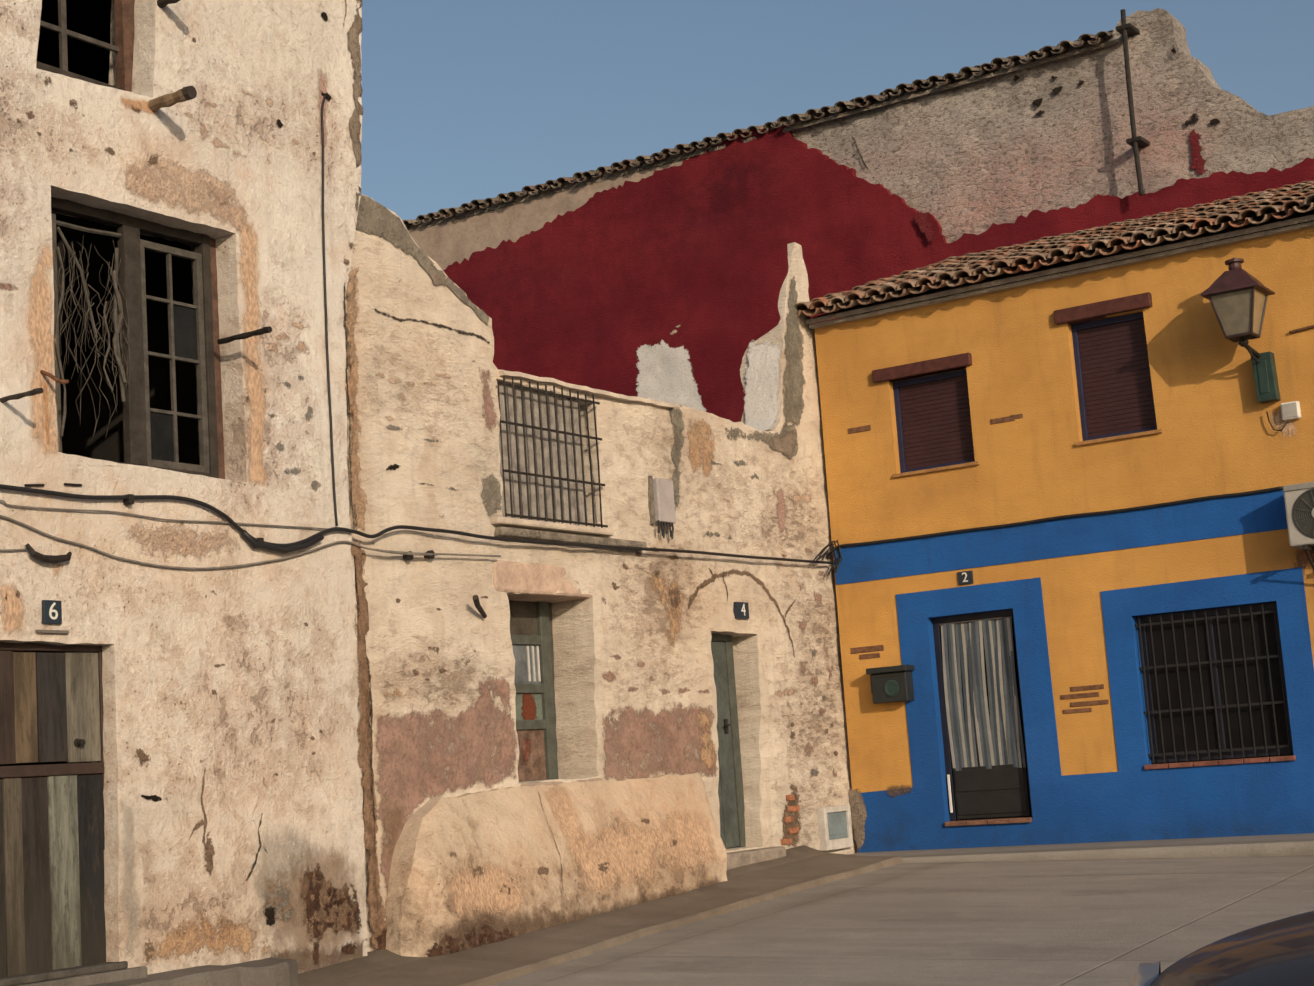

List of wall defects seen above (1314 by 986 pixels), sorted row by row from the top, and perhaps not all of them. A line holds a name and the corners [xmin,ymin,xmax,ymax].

flaking render [347,0,363,167]
peeling [125,153,247,232]
crack [343,280,490,525]
peeling [131,108,822,964]
crack [688,568,796,657]
peeling [801,648,833,733]
crack [189,769,213,875]
crack [246,813,267,881]